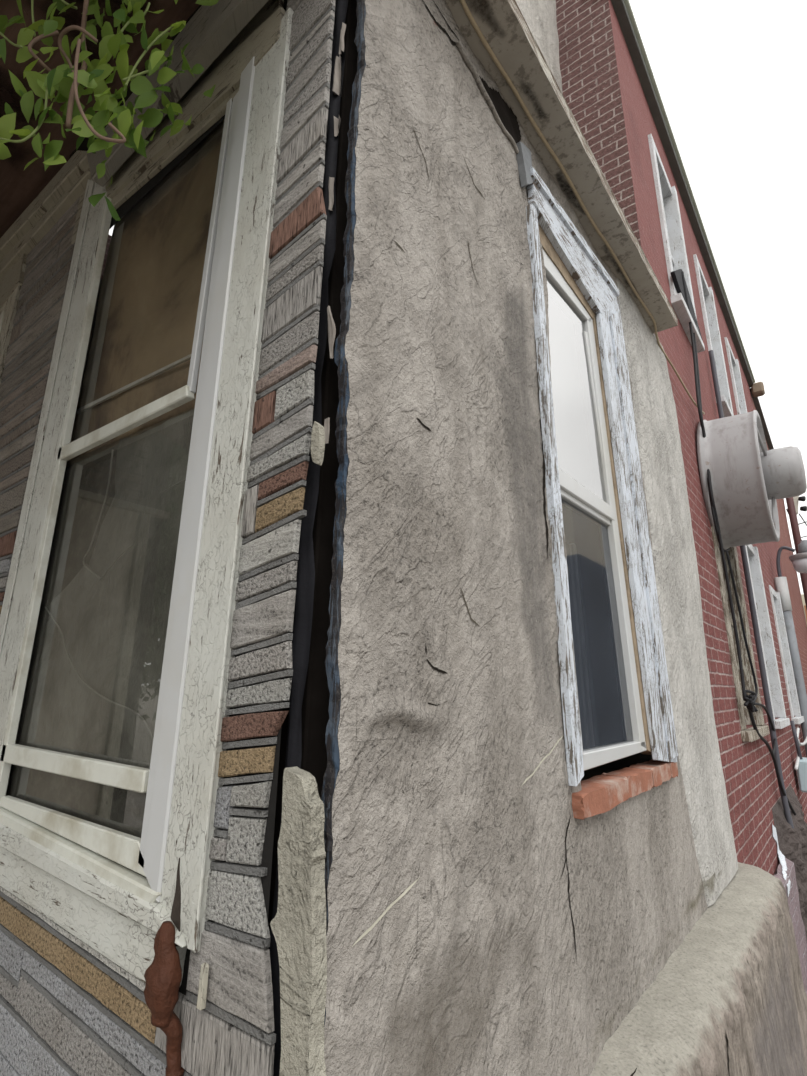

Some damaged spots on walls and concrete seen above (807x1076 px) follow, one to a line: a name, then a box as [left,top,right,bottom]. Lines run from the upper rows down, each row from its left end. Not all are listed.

leakage [0,77,35,124]
rust [144,921,185,1076]